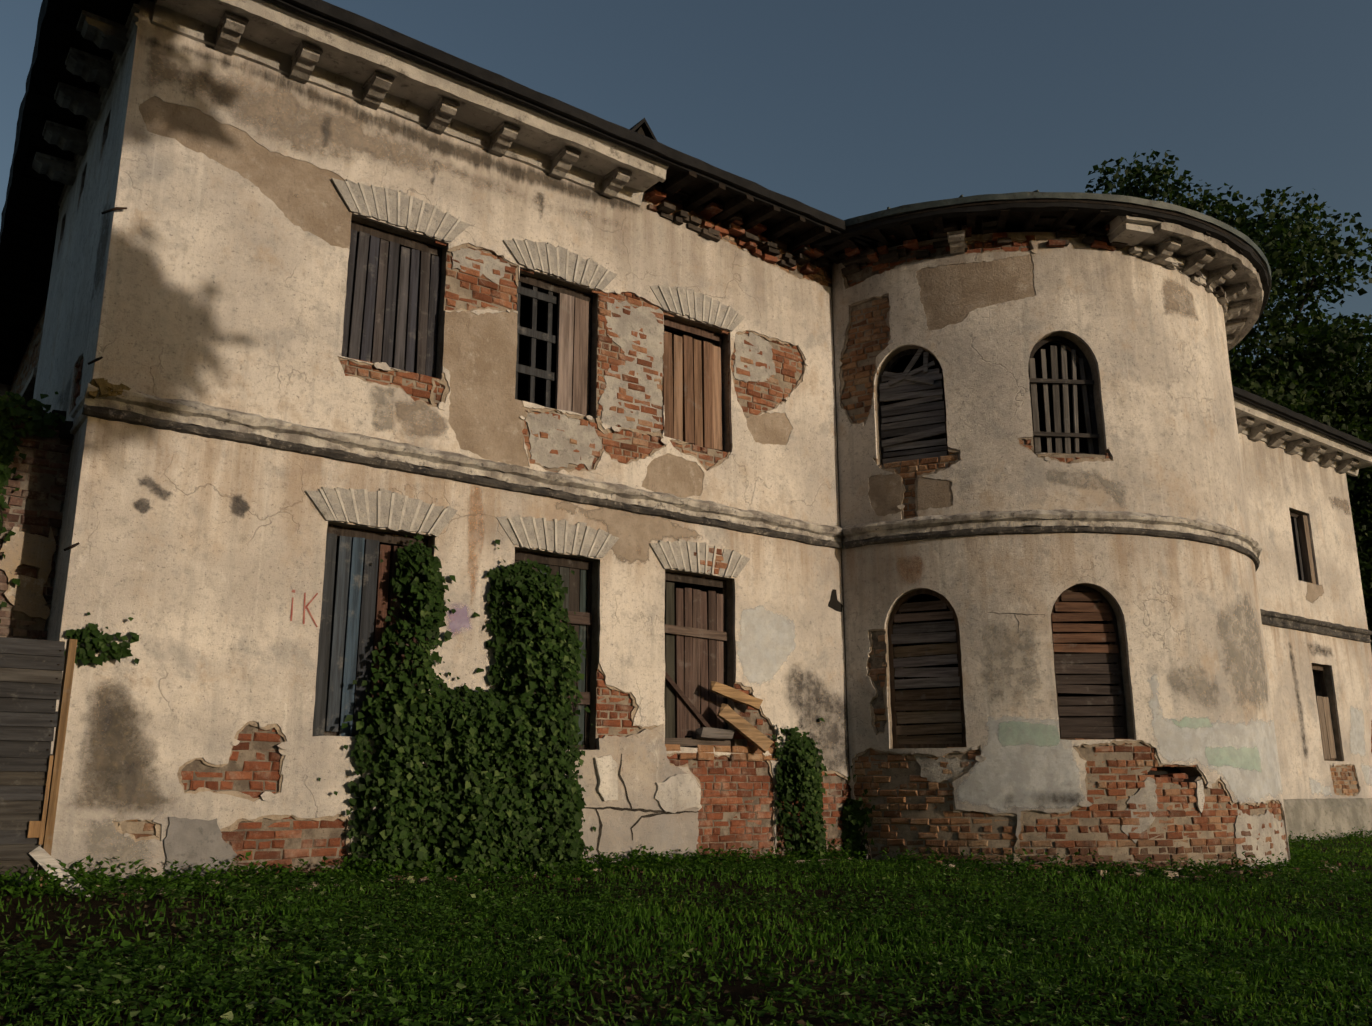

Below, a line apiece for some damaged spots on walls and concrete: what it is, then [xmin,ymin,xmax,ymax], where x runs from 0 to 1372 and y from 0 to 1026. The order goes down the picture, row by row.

peeling [139,56,492,249]
flaking render [60,356,84,412]
peeling [337,240,732,498]
flaking render [721,330,811,445]
peeling [644,191,1038,426]
leakage [78,685,168,878]
flaking render [177,719,353,878]
flaking render [595,654,657,749]
crack [584,754,699,865]
leakage [789,671,850,770]
flaking render [667,629,1290,873]